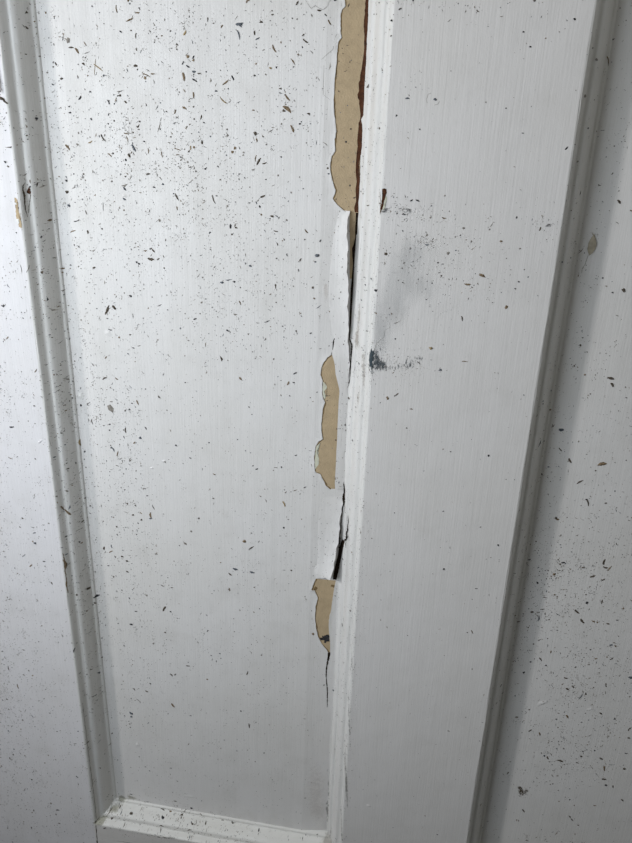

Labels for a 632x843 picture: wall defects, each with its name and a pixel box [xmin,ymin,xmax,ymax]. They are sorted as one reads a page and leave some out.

peeling [324,0,372,279]
peeling [308,350,343,654]
crack [329,211,358,580]
crack [324,652,332,705]